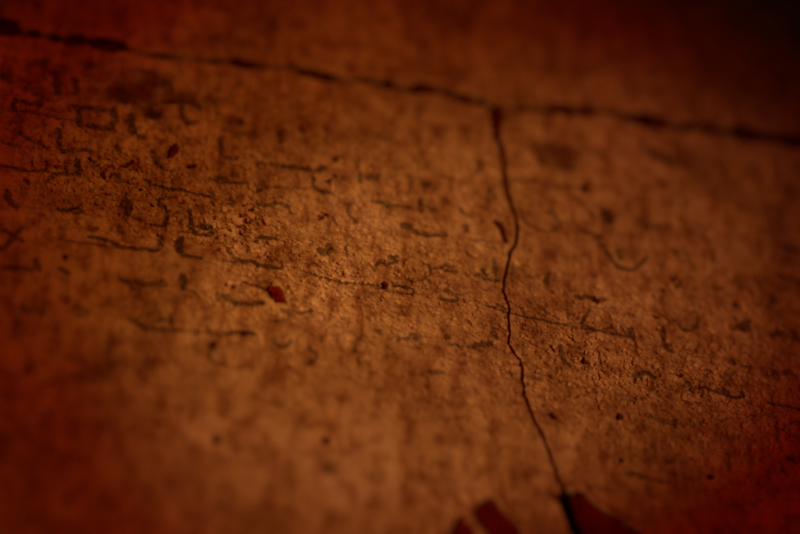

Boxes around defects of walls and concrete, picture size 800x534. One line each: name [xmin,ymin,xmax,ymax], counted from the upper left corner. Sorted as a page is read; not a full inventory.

crack [0,18,175,61]
crack [194,57,800,534]